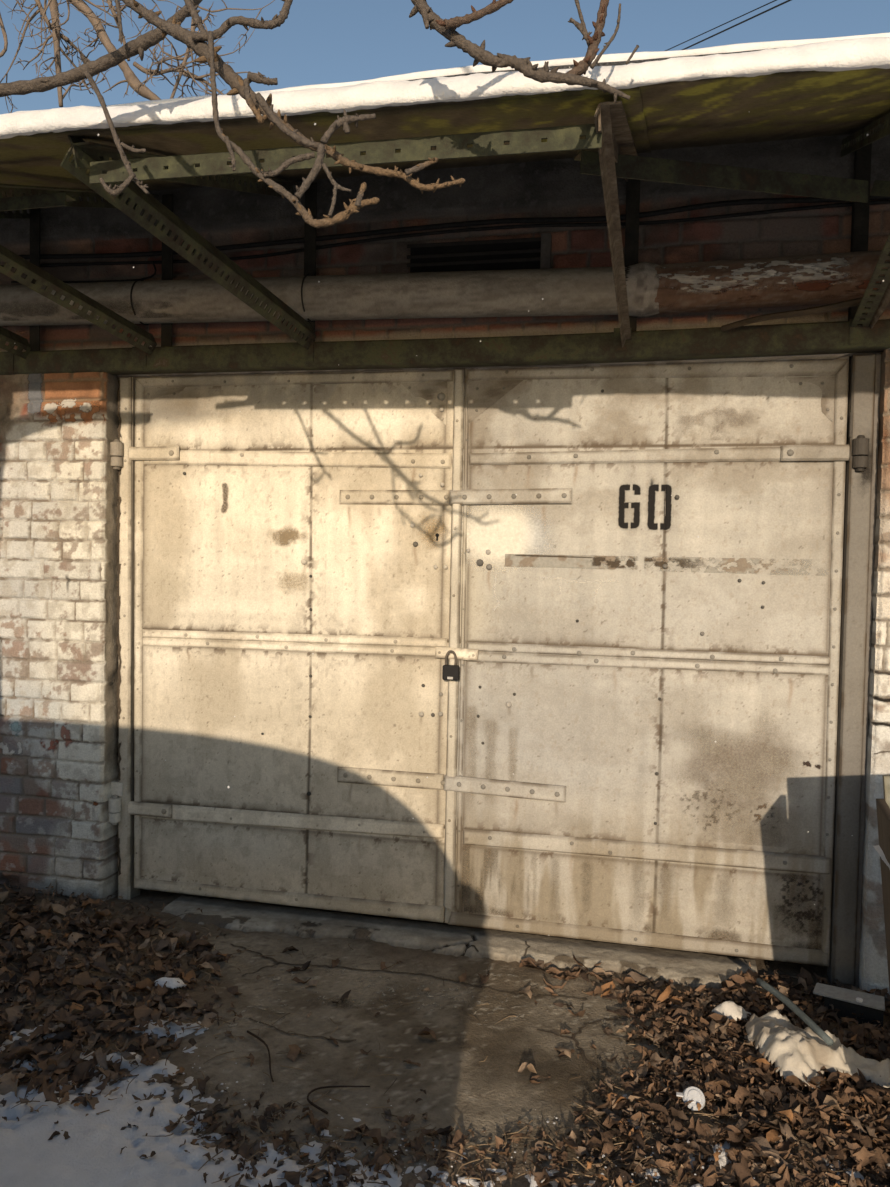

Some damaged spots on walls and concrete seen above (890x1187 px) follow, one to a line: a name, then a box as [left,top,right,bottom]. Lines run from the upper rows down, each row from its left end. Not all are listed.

peeling [659,257,848,292]
peeling [42,398,106,423]
corrosion [273,529,299,545]
peeling [41,724,73,752]
corrosion [780,876,823,932]
leakage [710,932,737,941]
crack [231,937,622,1076]